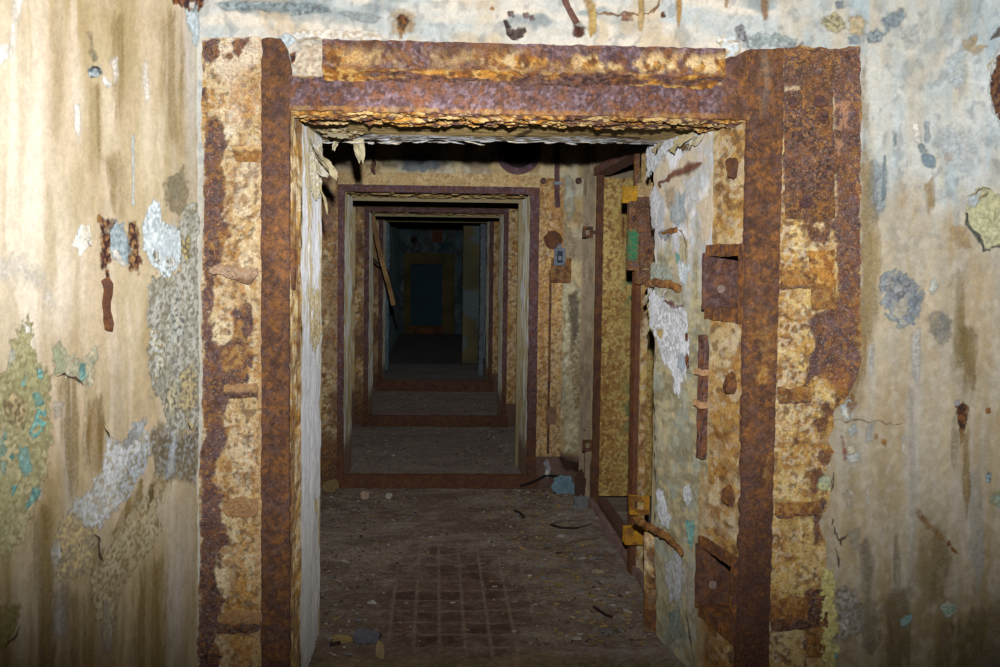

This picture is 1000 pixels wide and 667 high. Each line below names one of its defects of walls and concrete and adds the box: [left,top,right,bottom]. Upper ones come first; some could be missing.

flaking render [110,219,131,267]
peeling [142,199,200,442]
leakage [166,166,188,214]
peeling [308,128,705,398]
flaking render [878,269,939,329]
leakage [925,180,934,208]
leakage [911,310,976,399]
peeling [0,315,98,558]
leakage [53,381,105,489]
corrosion [951,400,970,506]
peeling [51,418,168,651]
leakage [113,479,143,534]